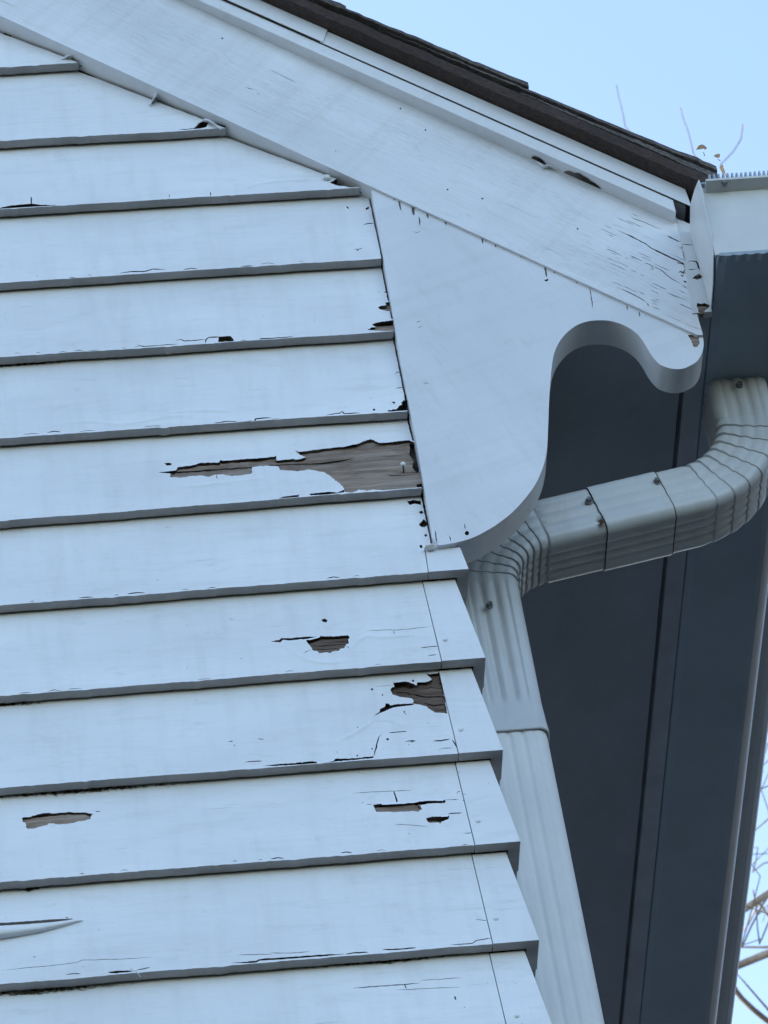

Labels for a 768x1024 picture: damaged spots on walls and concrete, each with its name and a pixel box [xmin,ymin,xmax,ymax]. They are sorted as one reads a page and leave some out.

peeling [368,294,395,336]
peeling [167,440,424,504]
peeling [306,635,348,653]
peeling [391,672,447,713]
peeling [22,811,91,829]
peeling [374,798,445,812]